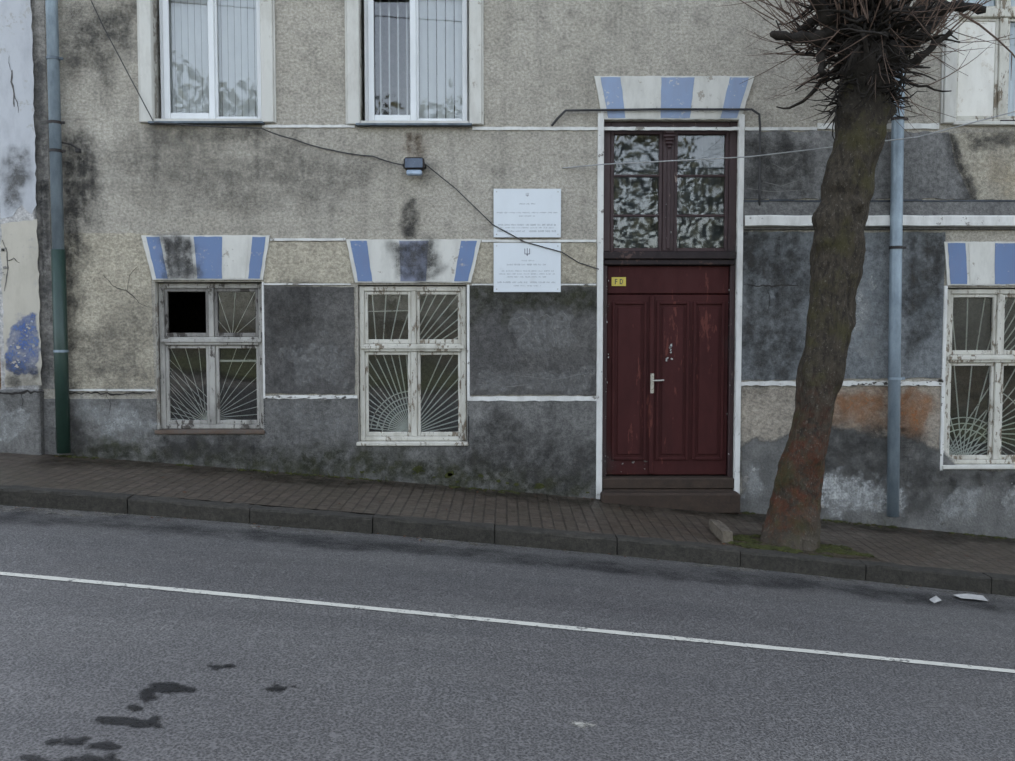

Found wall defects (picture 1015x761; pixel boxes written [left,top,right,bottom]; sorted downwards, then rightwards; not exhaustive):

crack [8,62,19,111]
damp [34,62,46,166]
damp [6,156,28,204]
damp [36,178,50,218]
damp [63,137,94,217]
damp [395,240,438,280]
peeling [5,313,39,374]